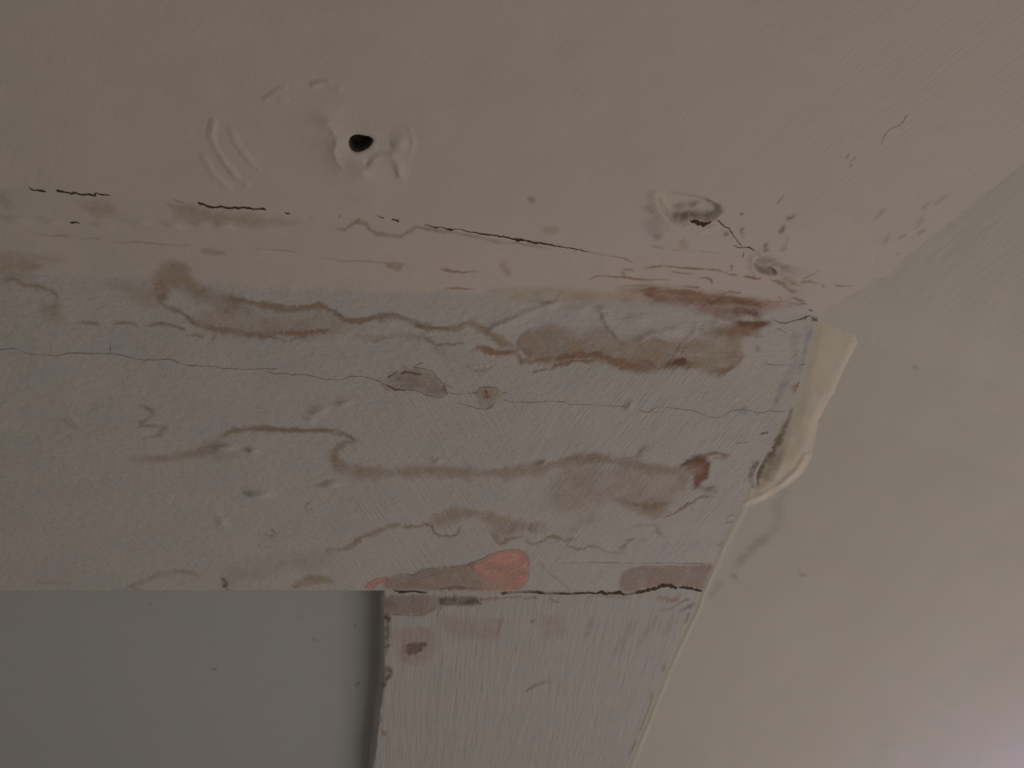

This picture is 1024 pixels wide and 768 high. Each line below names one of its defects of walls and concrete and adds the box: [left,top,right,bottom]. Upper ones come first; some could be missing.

crack [29,187,110,196]
crack [175,200,312,217]
crack [425,225,631,262]
crack [717,220,755,257]
water stain [231,297,403,324]
water stain [478,327,713,371]
peeling [741,322,858,509]
crack [502,562,704,596]